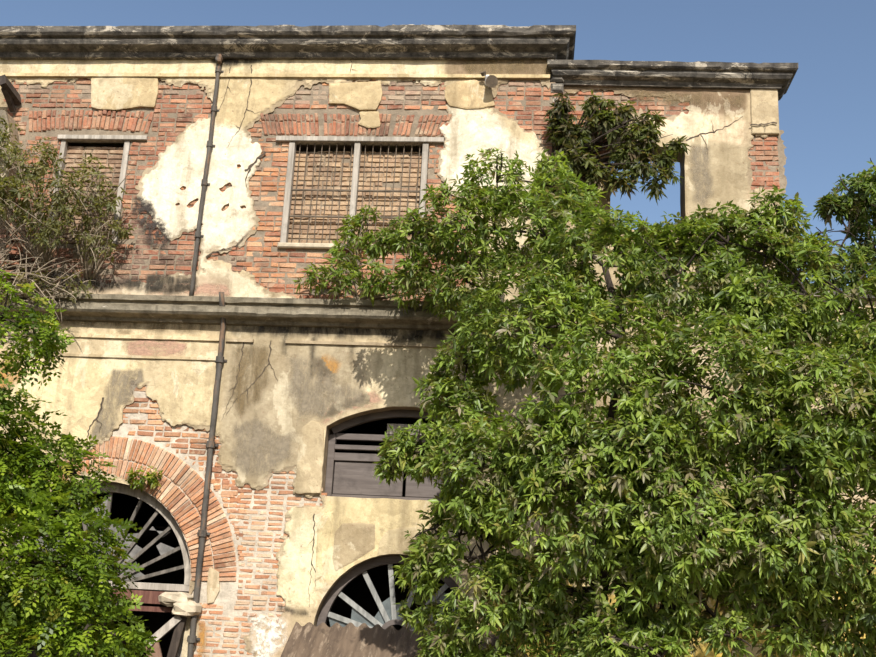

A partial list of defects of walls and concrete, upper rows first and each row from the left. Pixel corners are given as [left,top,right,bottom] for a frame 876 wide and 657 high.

flaking render [3,78,472,301]
crack [686,116,777,148]
flaking render [748,130,787,194]
crack [221,341,278,421]
water stain [232,326,457,415]
water stain [235,421,290,473]
flaking render [75,381,327,657]